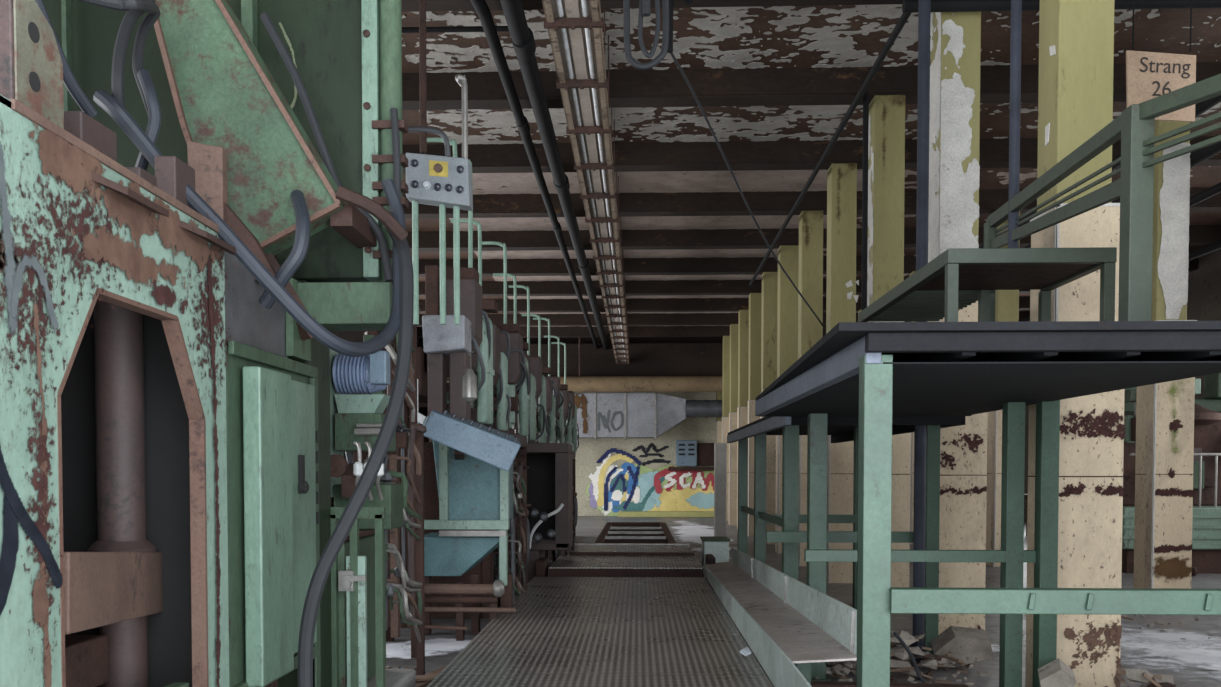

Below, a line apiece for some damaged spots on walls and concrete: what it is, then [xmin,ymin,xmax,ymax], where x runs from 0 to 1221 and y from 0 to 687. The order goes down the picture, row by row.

peeling [402,11,520,73]
peeling [418,108,569,144]
peeling [601,4,1050,263]
peeling [472,172,581,195]
peeling [609,105,874,326]
peeling [1157,143,1193,319]
rust [29,113,224,687]
rust [1060,405,1125,441]
rust [1059,481,1124,498]
rust [1155,467,1193,497]
rust [1154,544,1192,579]
rust [1064,620,1122,687]